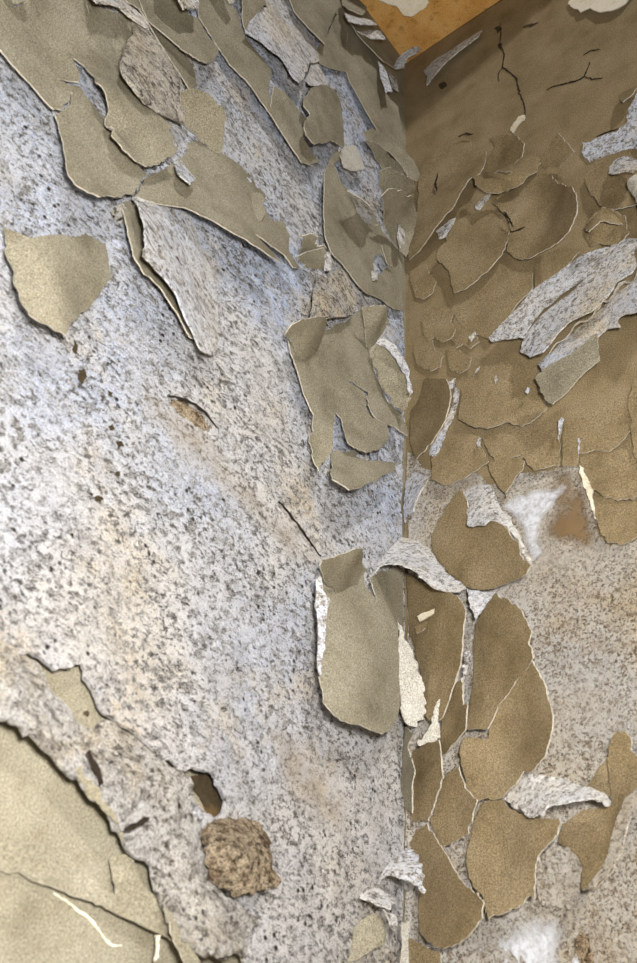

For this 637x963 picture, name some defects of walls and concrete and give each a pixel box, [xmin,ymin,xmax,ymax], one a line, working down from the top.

peeling [0,0,319,167]
peeling [231,0,350,147]
peeling [341,0,367,15]
peeling [344,13,421,148]
peeling [423,26,502,89]
crack [497,22,526,115]
crack [547,49,603,90]
peeling [568,0,629,13]
flaking render [0,49,444,963]
flaking render [362,93,637,963]